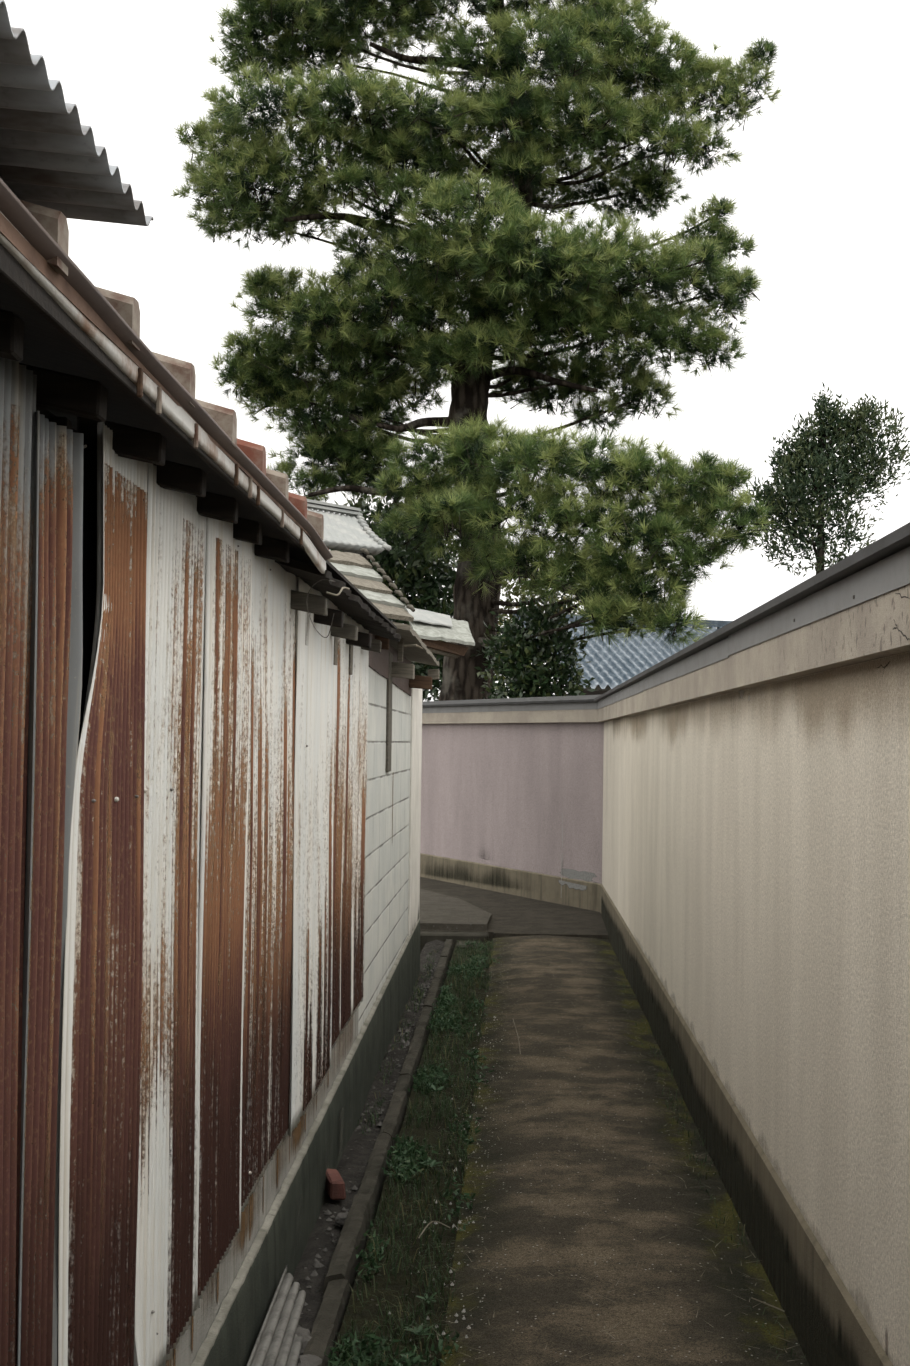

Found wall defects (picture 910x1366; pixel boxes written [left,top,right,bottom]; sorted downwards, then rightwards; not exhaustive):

rust [0,404,368,1366]
crack [877,593,910,673]